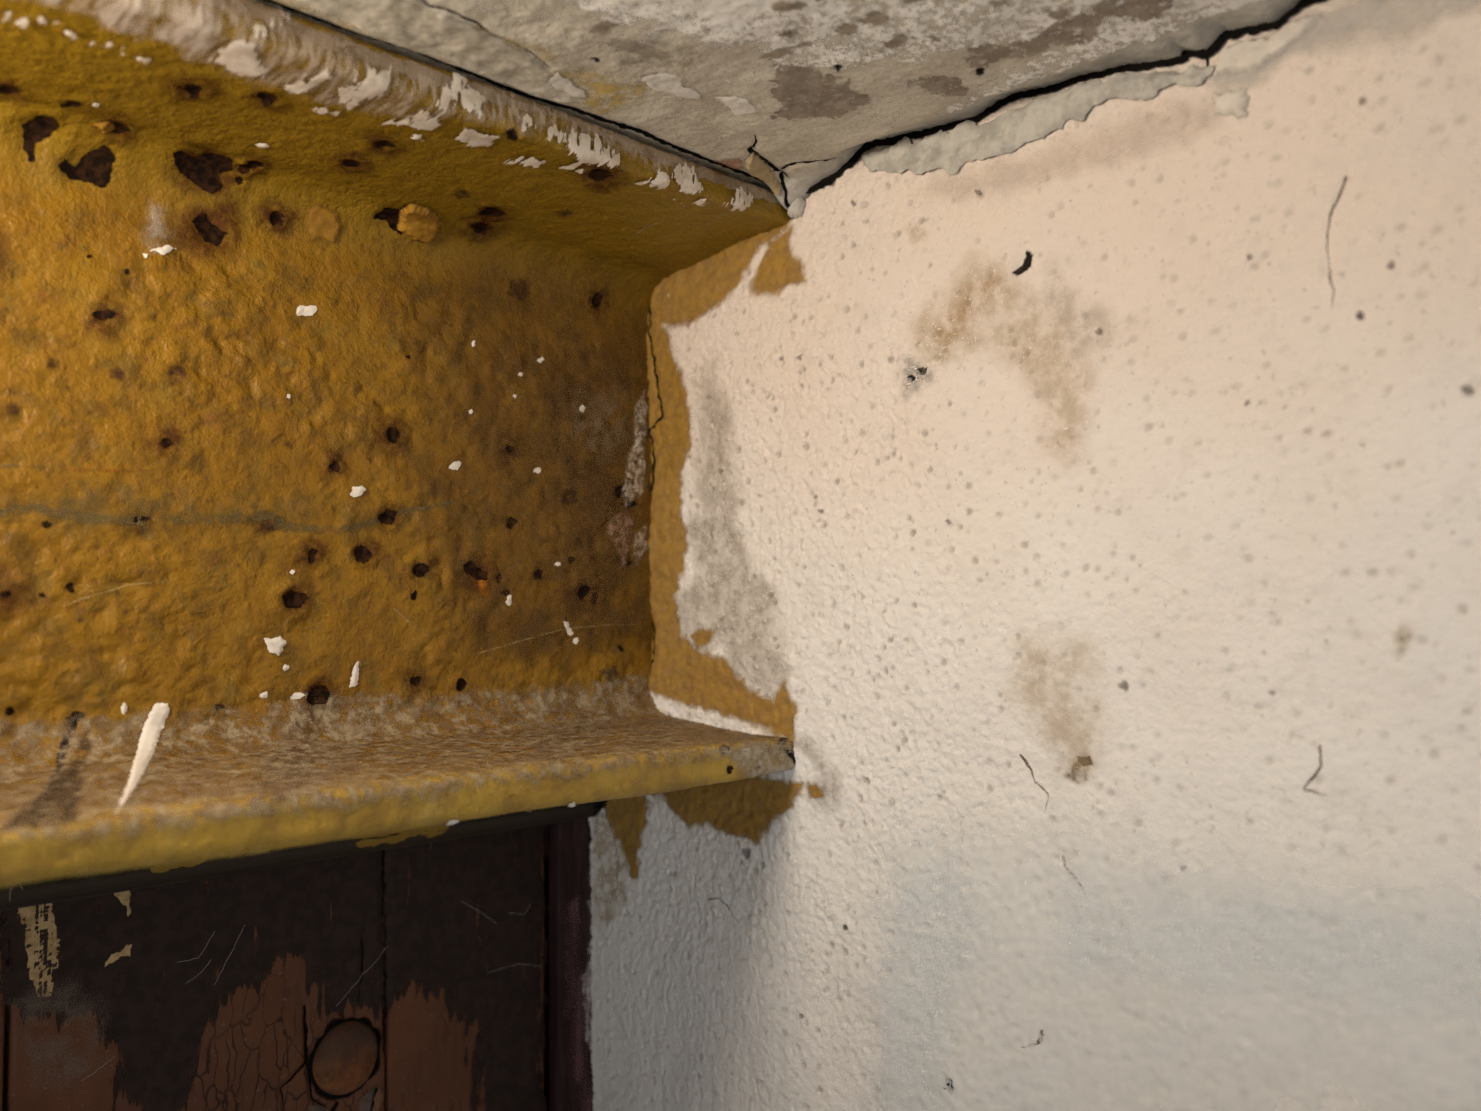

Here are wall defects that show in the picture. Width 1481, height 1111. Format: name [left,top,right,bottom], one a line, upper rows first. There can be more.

crack [265,0,1326,219]
rust [577,164,620,192]
crack [1326,176,1348,303]
rust [88,304,121,334]
rust [411,561,433,600]
peeling [691,630,714,647]
rust [279,683,331,792]
rust [26,711,85,821]
peeling [807,784,822,798]
peeling [114,891,131,917]
peeling [17,903,61,998]
peeling [105,944,132,967]